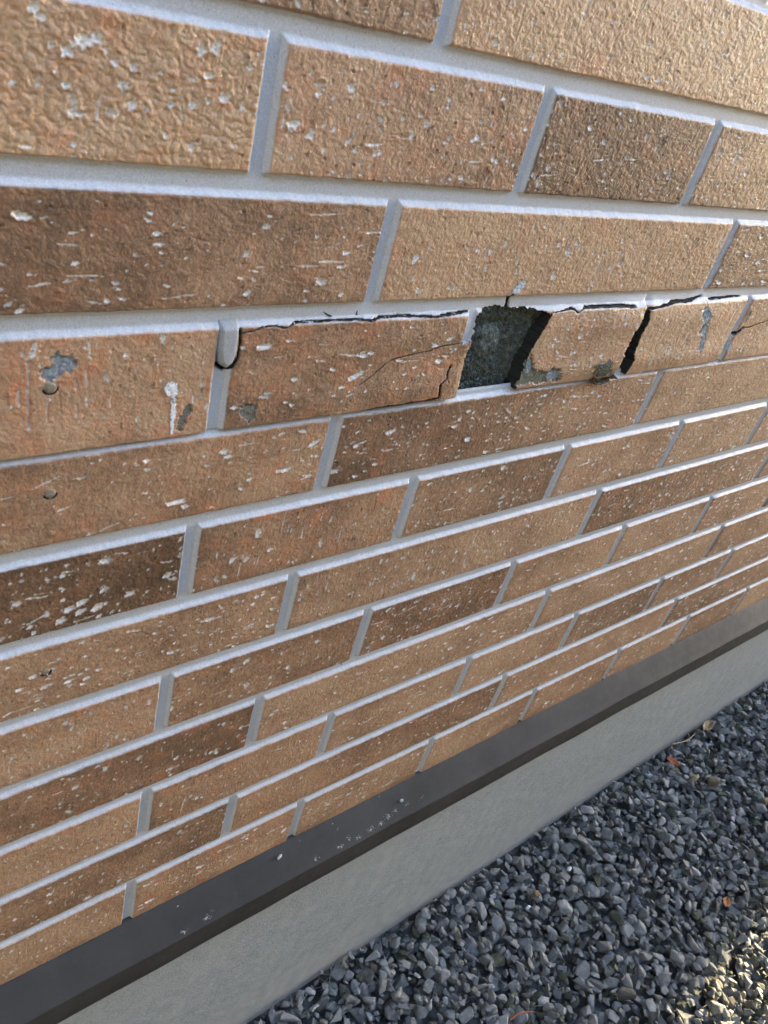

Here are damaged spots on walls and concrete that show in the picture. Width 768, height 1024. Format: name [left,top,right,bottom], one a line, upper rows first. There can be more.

crack [552,295,739,313]
crack [244,310,468,333]
spalling [458,305,562,390]
spalling [40,351,77,383]
crack [360,343,459,410]
peeling [588,359,618,385]